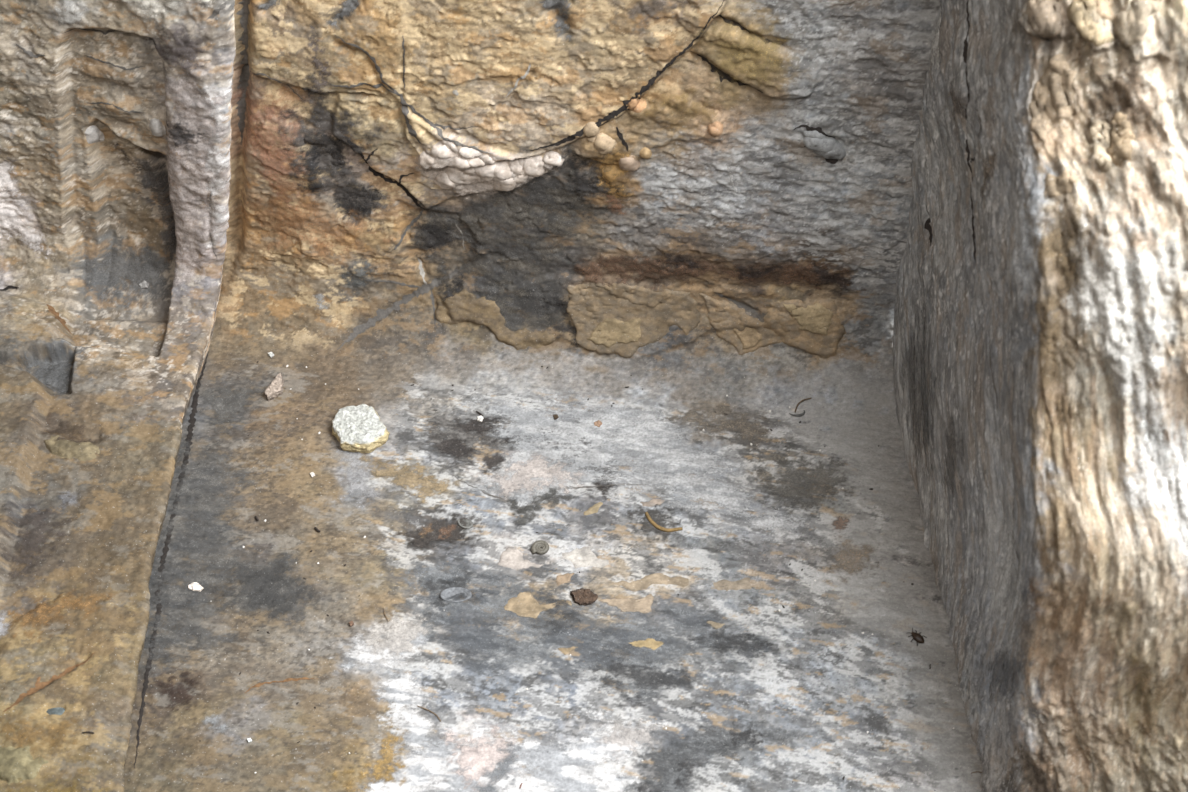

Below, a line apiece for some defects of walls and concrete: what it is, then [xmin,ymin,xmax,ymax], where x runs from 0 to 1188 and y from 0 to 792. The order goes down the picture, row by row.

crack [206,0,303,145]
damp [302,135,381,219]
crack [329,34,490,154]
crack [337,141,492,350]
damp [415,219,460,249]
damp [416,140,599,199]
crack [530,0,783,151]
crack [963,0,981,266]
damp [556,324,577,345]
damp [361,453,459,503]
damp [421,390,878,573]
damp [340,513,799,792]